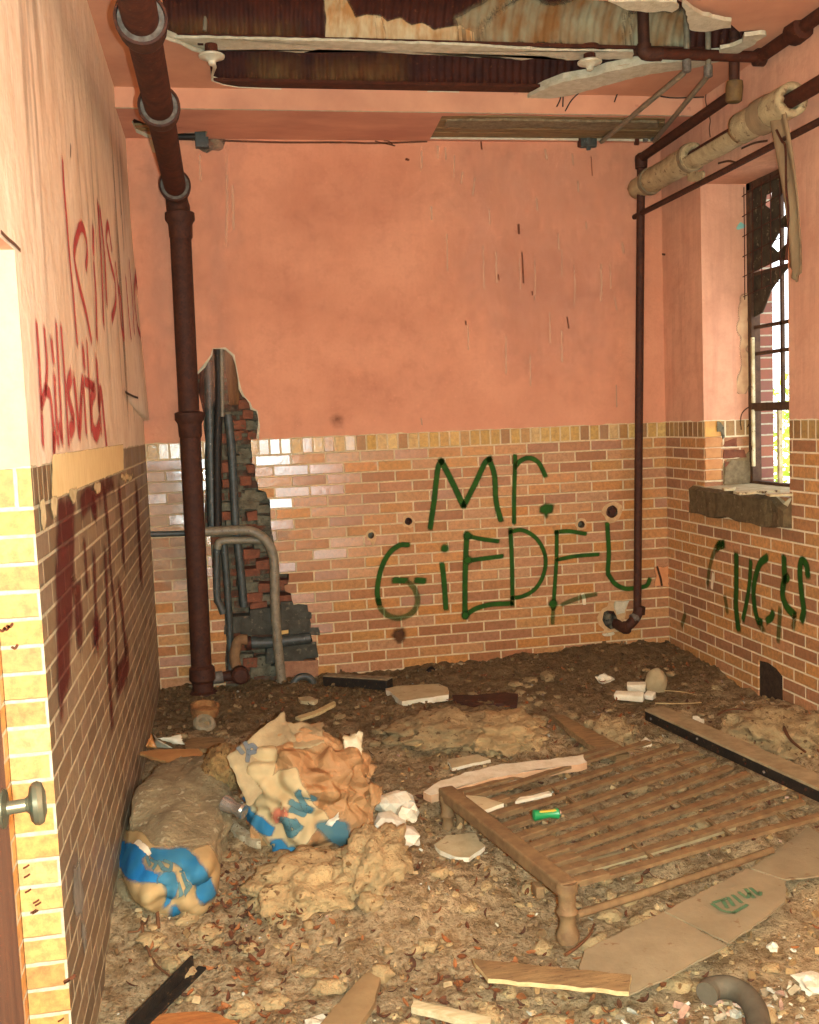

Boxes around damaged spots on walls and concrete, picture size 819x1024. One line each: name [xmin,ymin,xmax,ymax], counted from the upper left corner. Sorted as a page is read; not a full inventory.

flaking render [166,36,204,53]
peeling [324,0,684,47]
flaking render [527,30,766,99]
flaking render [198,347,260,444]
flaking render [222,462,255,488]
flaking render [243,547,292,609]
flaking render [276,658,318,679]